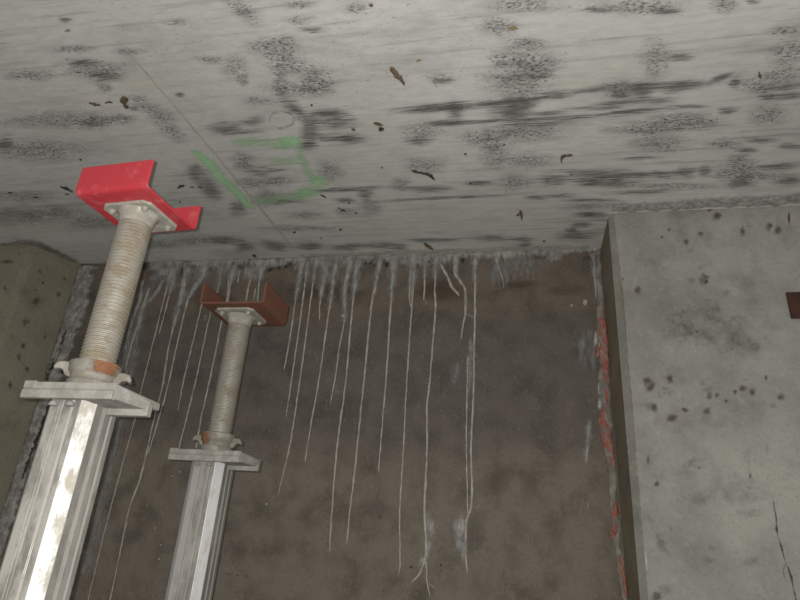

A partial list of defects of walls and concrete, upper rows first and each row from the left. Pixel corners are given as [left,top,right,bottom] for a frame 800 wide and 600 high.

leakage [589,0,682,16]
leakage [54,46,123,91]
leakage [245,34,362,148]
leakage [394,18,800,195]
leakage [109,194,610,600]
crack [774,508,796,597]